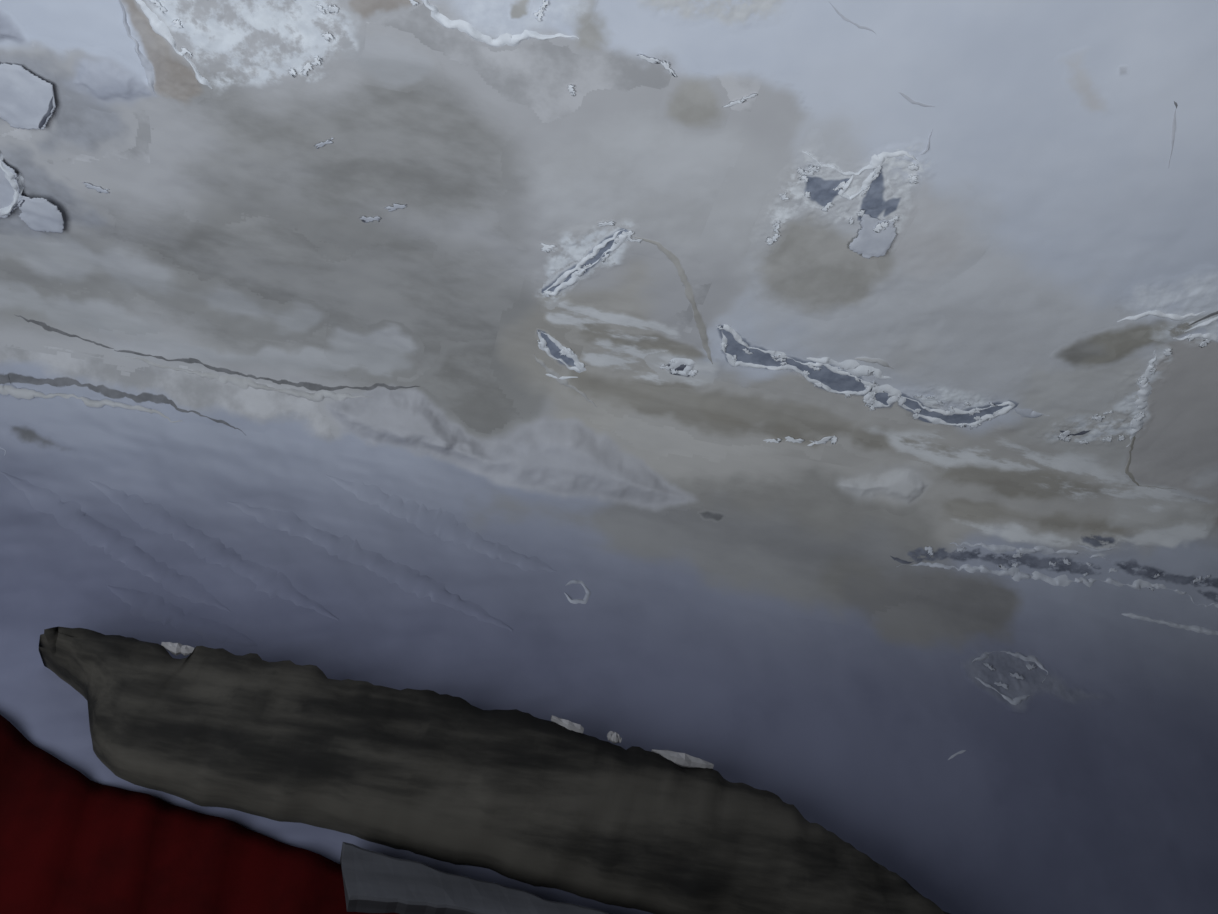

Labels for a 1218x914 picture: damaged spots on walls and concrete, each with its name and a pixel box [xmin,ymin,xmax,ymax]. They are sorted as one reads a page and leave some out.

peeling [0,0,598,243]
peeling [748,128,938,259]
spalling [527,217,643,310]
crack [0,314,420,432]
spalling [534,328,597,407]
water stain [0,0,1218,663]
spalling [644,324,1020,429]
peeling [1033,263,1218,453]